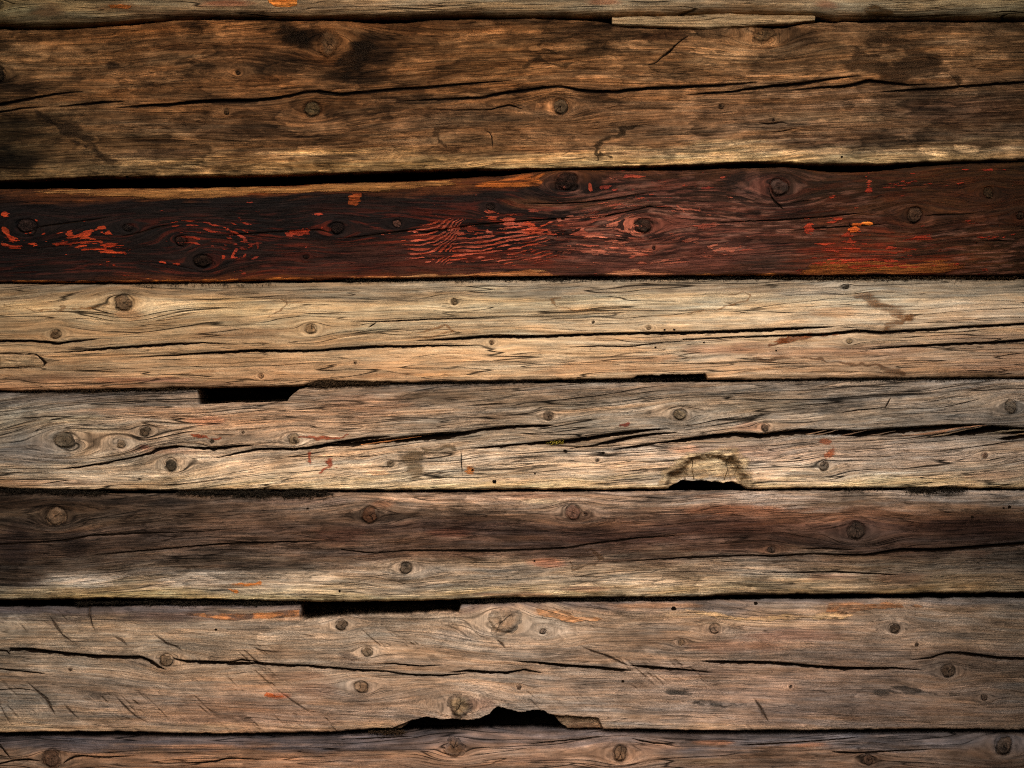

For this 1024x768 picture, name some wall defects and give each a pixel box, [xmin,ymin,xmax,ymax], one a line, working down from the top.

crack [0,36,1024,147]
peeling [1,211,332,283]
peeling [44,180,455,212]
peeling [354,170,753,279]
peeling [795,217,965,276]
peeling [865,173,932,196]
crack [0,318,1024,369]
crack [56,398,1024,480]
crack [0,648,1024,691]
spalling [554,715,603,728]